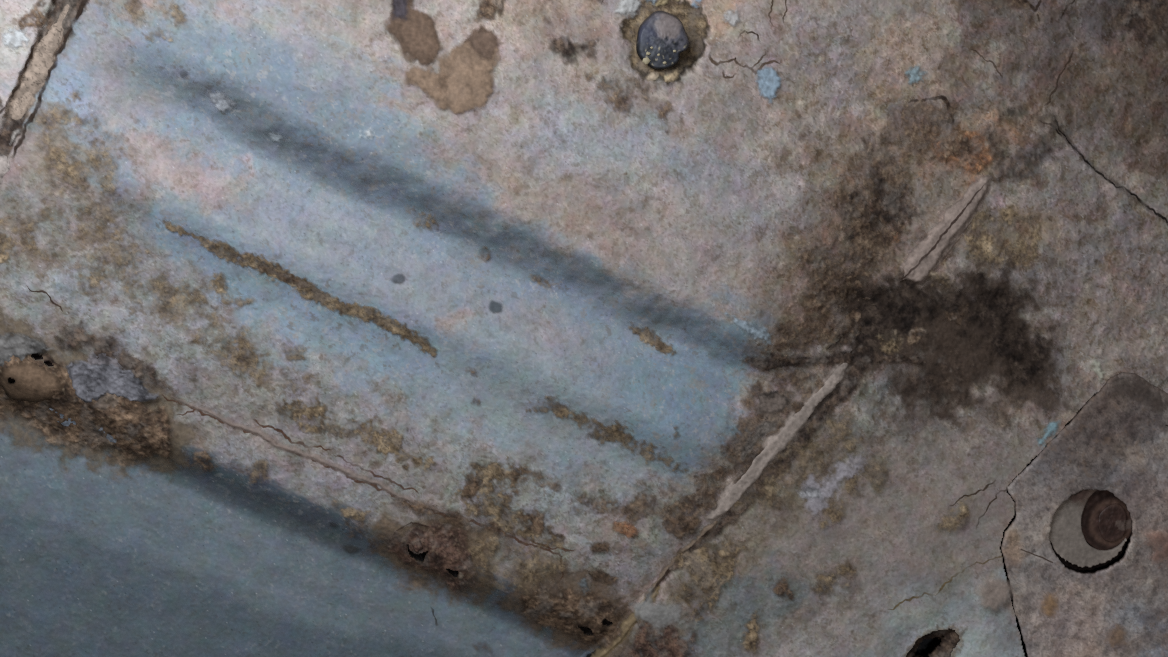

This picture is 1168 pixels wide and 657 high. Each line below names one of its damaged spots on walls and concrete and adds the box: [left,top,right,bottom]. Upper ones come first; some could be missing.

corrosion [551,36,595,62]
corrosion [586,74,656,111]
crack [1045,54,1168,225]
corrosion [54,321,166,387]
corrosion [151,274,268,387]
corrosion [277,375,436,470]
corrosion [577,100,1057,657]
leakage [832,261,1068,420]
crack [163,396,573,578]
corrosion [444,457,564,601]
crack [952,483,997,513]
crack [890,577,952,610]